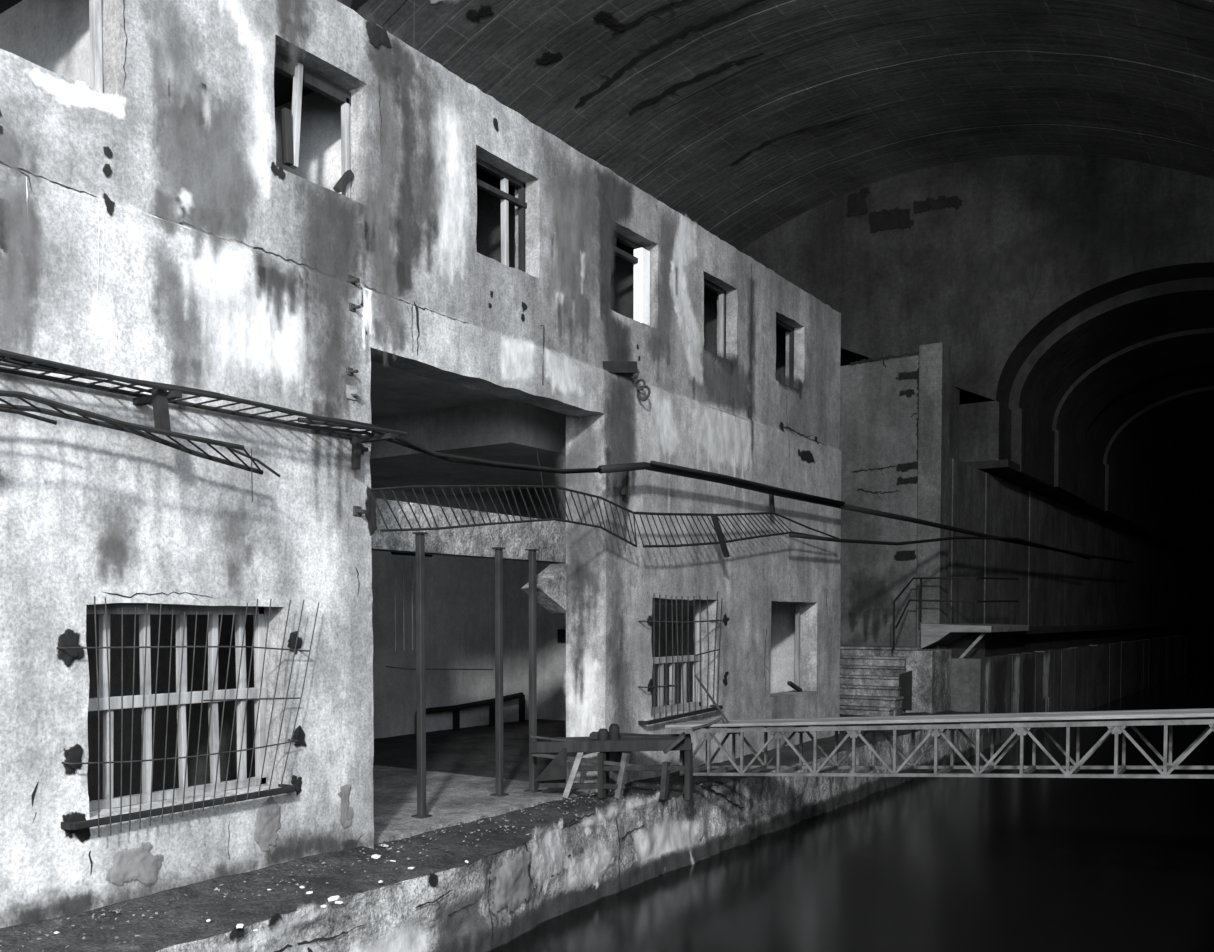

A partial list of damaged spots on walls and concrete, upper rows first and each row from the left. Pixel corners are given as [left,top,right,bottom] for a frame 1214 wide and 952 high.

crack [574,0,766,114]
crack [729,114,867,166]
crack [0,160,97,197]
crack [153,214,310,283]
damp [151,0,468,471]
crack [363,285,467,355]
crack [105,590,212,598]
peeling [106,842,164,886]